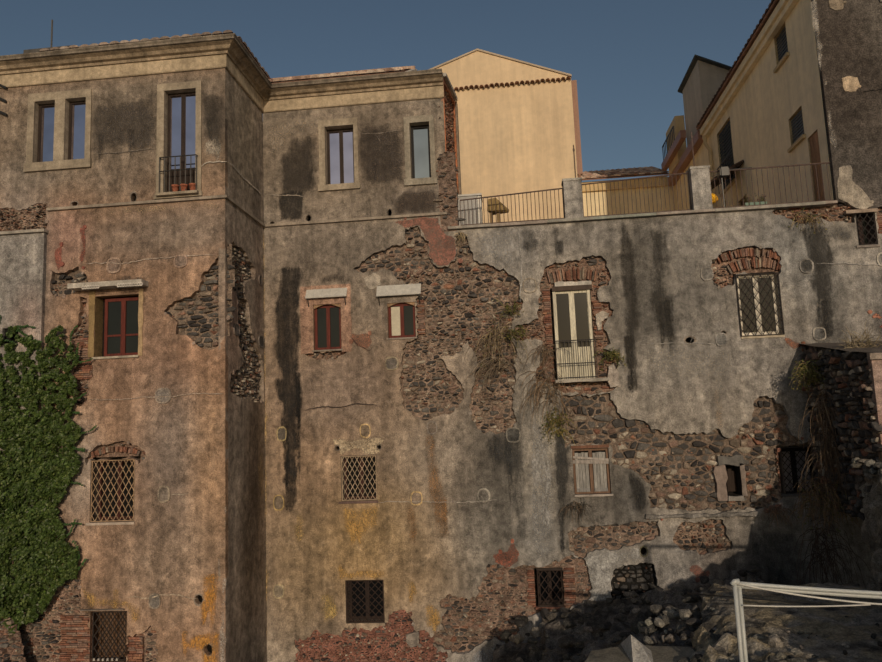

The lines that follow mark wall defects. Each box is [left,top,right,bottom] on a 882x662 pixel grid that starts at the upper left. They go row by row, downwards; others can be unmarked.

spalling [0,204,49,231]
damp [269,122,314,219]
spalling [772,203,855,224]
spalling [164,244,263,404]
damp [275,267,303,510]
crack [305,403,374,411]
spalling [355,207,882,555]
spalling [19,578,93,662]
spalling [127,627,158,662]
spalling [295,519,663,662]
spalling [637,565,717,662]
spalling [745,611,882,662]